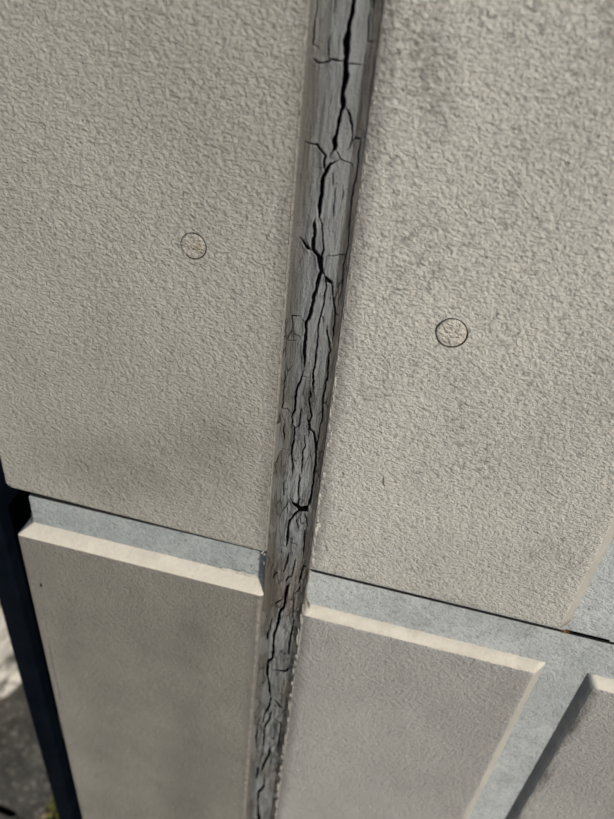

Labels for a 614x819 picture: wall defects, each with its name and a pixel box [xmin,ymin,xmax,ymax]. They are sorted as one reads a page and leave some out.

crack [252,0,374,819]